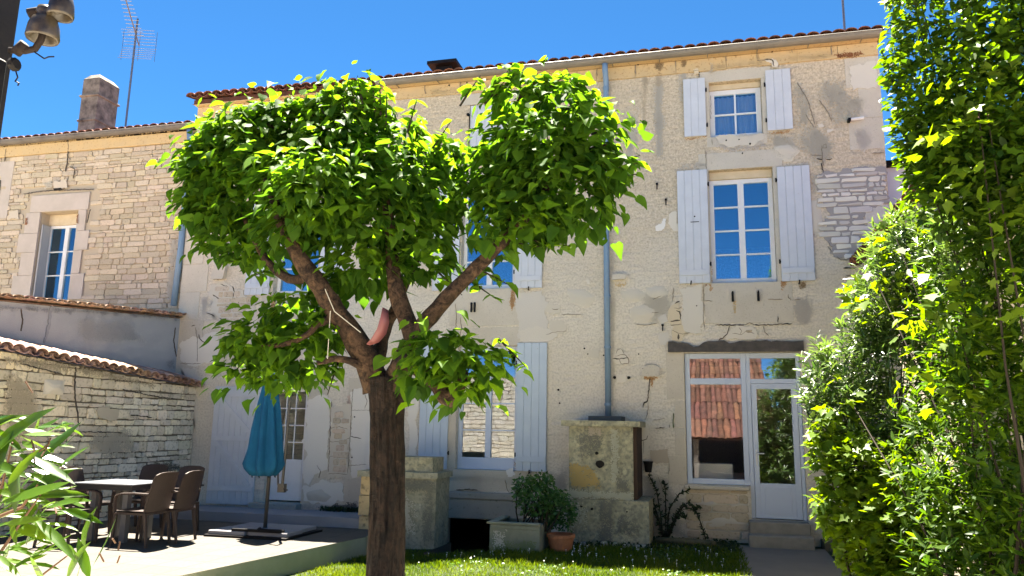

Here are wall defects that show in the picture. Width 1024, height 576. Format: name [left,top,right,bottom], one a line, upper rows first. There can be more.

damp [715,76,874,192]
crack [797,83,832,173]
flaking render [815,166,890,260]
peeling [658,283,706,346]
crack [637,285,800,340]
crack [20,363,178,433]
peeling [302,388,370,506]